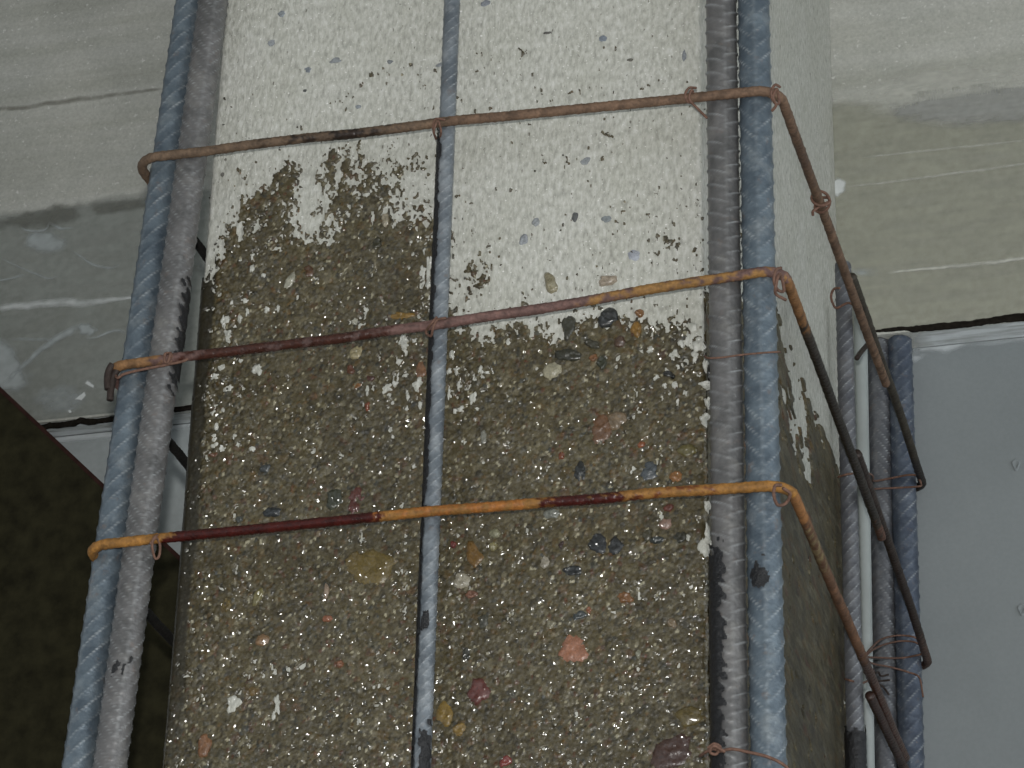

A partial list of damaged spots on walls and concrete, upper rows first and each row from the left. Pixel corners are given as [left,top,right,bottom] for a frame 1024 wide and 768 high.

spalling [162,0,925,768]